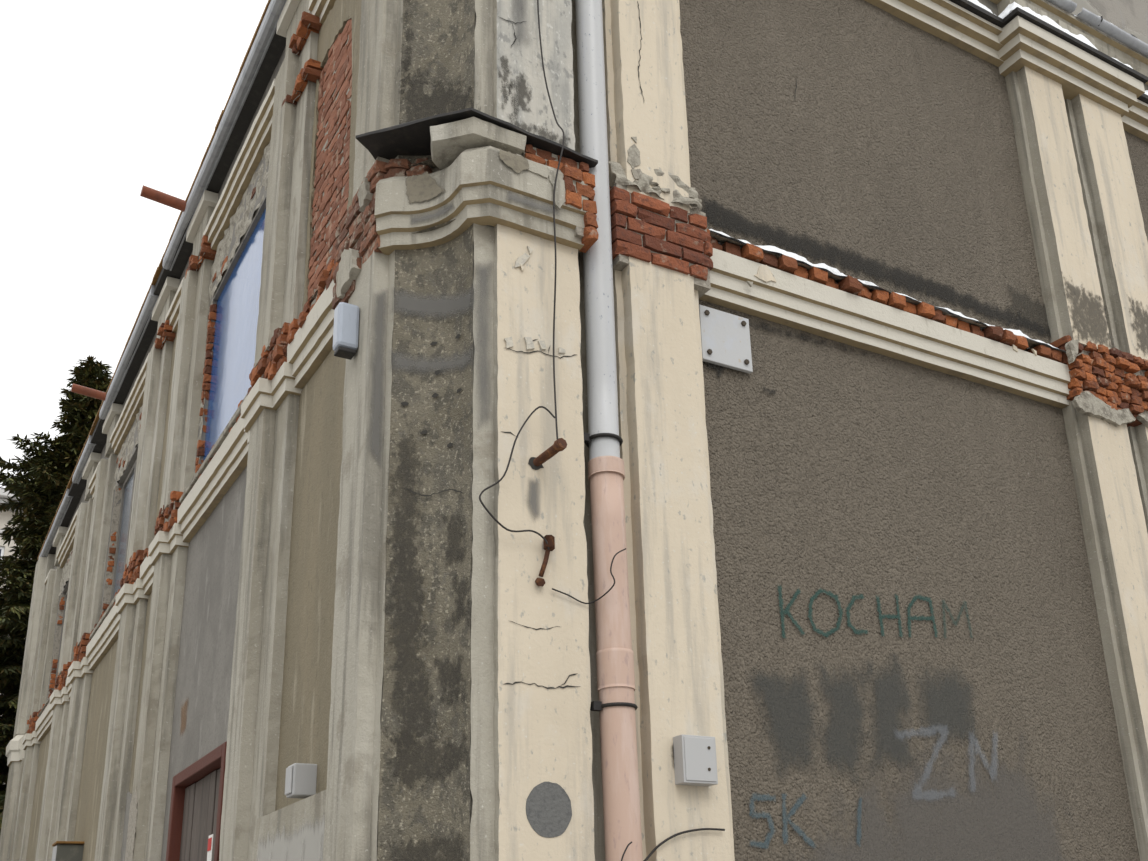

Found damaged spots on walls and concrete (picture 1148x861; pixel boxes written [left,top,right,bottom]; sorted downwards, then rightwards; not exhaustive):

damp [400,0,481,122]
peeling [282,0,446,311]
spalling [499,137,713,298]
flaking render [185,140,271,477]
spalling [247,322,290,395]
damp [371,267,488,460]
spalling [1050,335,1148,428]
spalling [154,491,183,535]
spalling [47,550,91,700]
damp [384,434,470,789]
crack [505,673,581,689]
damp [389,834,465,861]